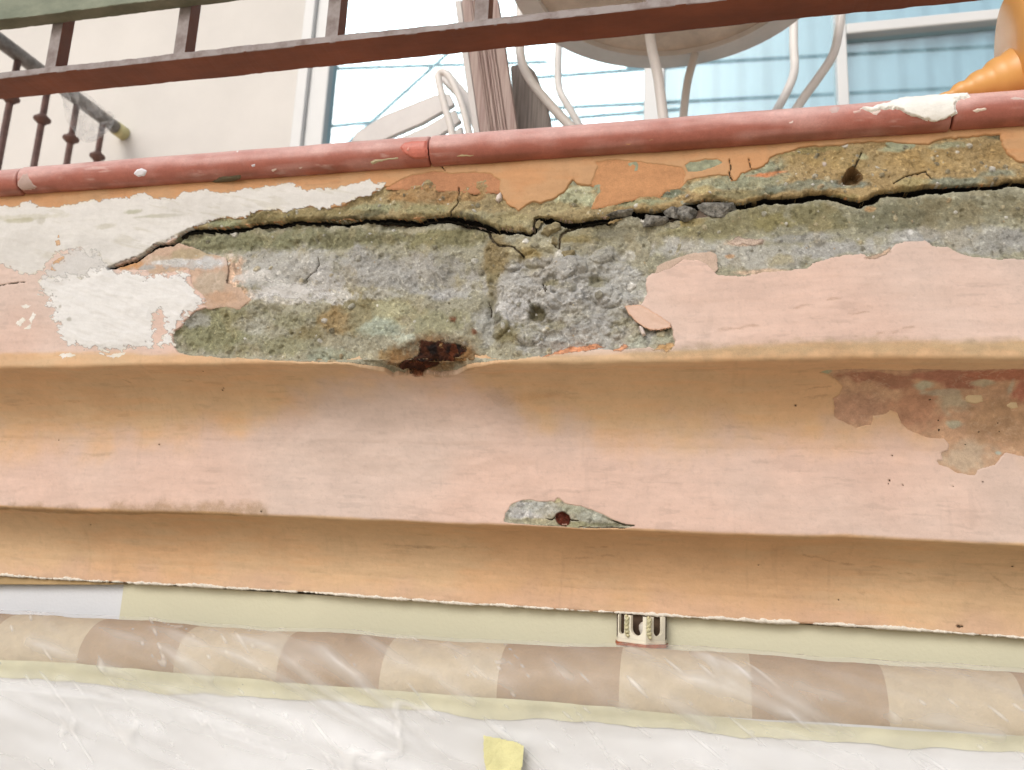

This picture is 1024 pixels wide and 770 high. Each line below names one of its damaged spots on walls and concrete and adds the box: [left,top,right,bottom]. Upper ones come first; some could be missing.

spalling [110,135,1024,373]
crack [111,159,1024,270]
corrosion [388,337,471,377]
peeling [822,368,1024,475]
corrosion [555,511,571,526]
spalling [504,498,635,529]